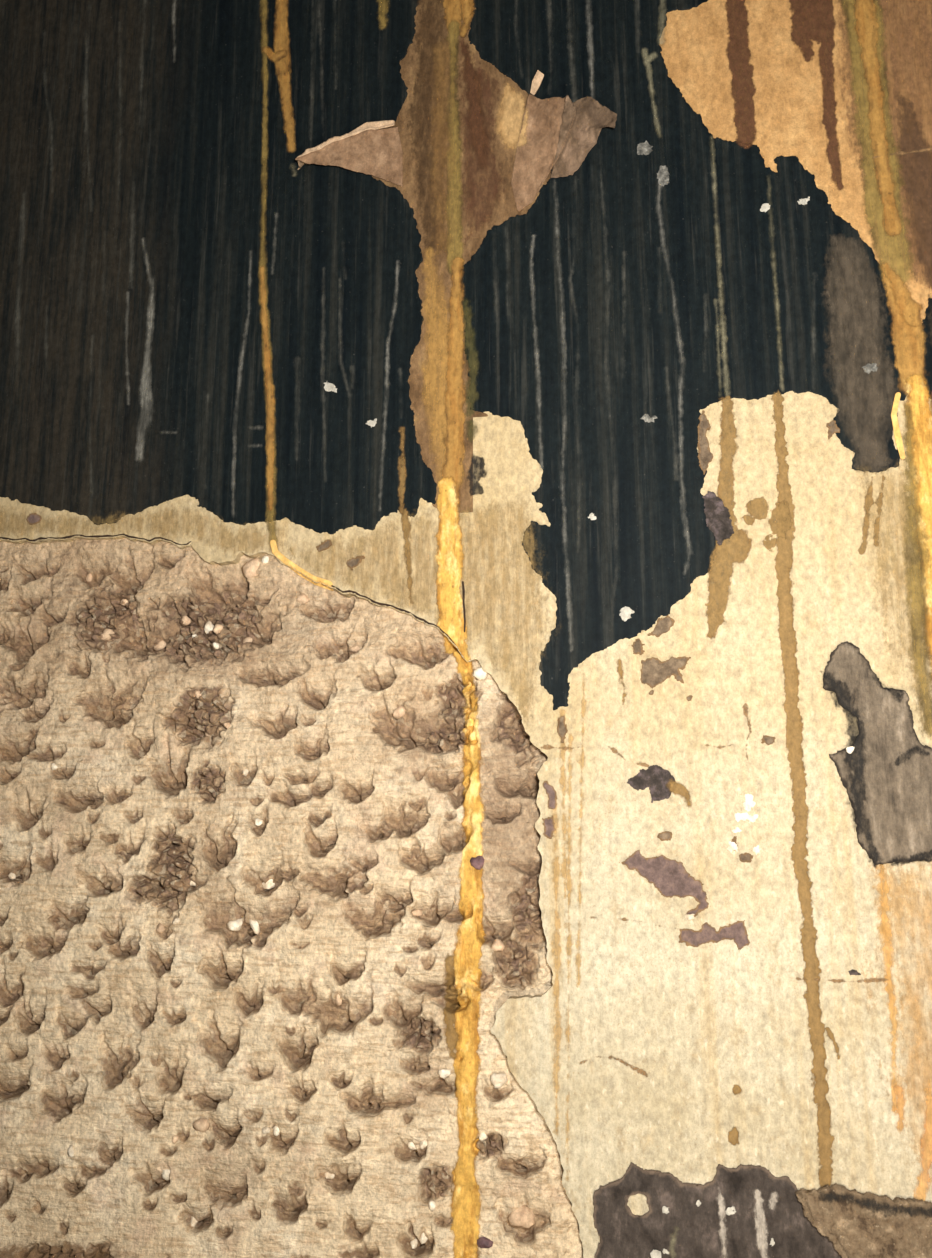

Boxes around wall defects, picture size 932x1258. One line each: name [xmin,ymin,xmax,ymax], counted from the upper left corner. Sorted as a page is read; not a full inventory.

corrosion [259,0,334,591]
peeling [295,0,617,513]
peeling [660,0,738,142]
damp [726,0,756,149]
peeling [744,0,881,265]
damp [789,0,865,190]
corrosion [842,0,932,736]
damp [878,0,932,288]
corrosion [398,427,413,604]
corrosion [422,0,485,1258]
peeling [619,606,634,621]
damp [755,1190,778,1258]